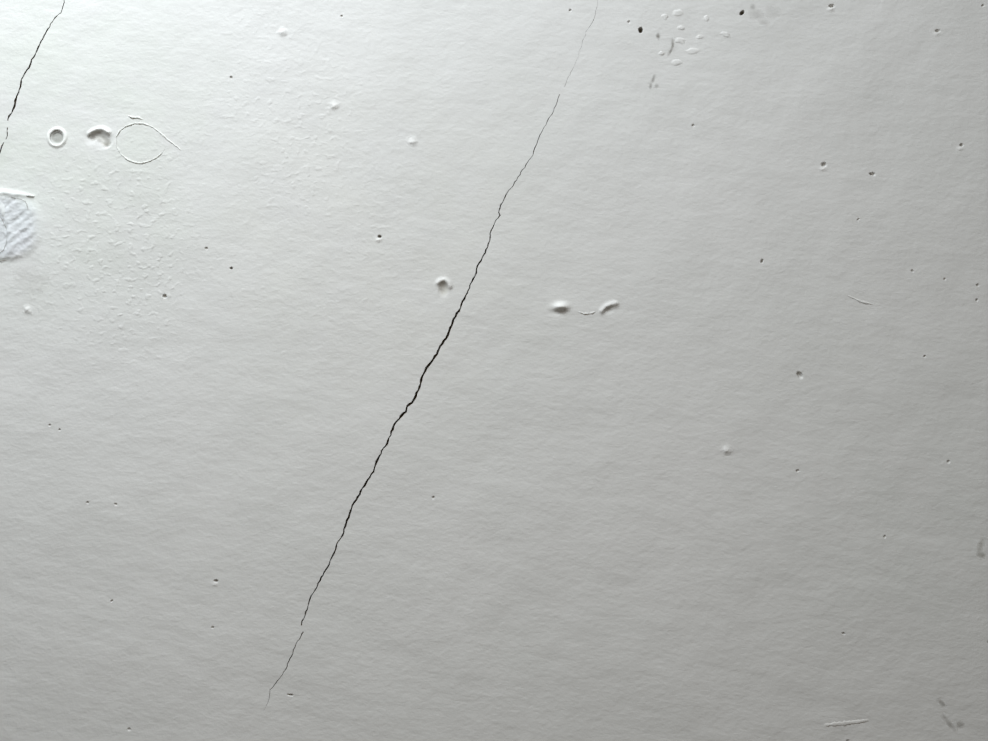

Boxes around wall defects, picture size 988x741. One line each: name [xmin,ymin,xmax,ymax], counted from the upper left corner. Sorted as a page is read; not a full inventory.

crack [0,1,65,153]
crack [268,0,598,701]